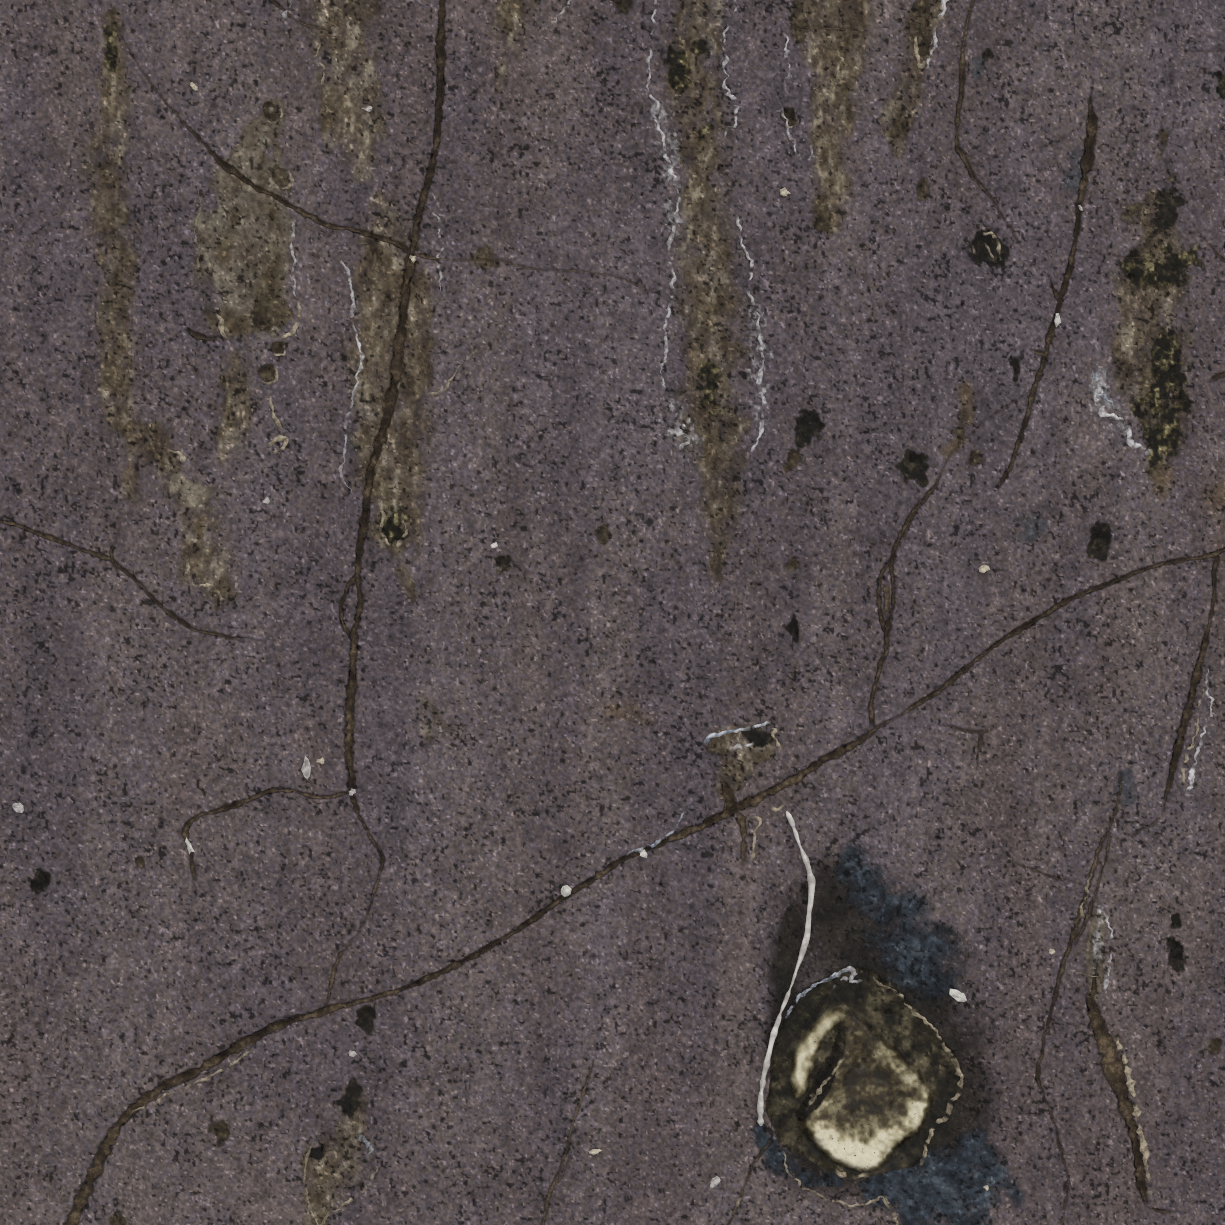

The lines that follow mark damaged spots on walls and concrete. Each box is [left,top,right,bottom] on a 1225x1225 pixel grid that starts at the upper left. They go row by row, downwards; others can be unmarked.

leakage [781,0,869,233]
crack [955,0,1018,242]
crack [0,520,247,639]
leakage [218,357,250,457]
crack [145,0,450,926]
leakage [646,0,768,579]
crack [999,91,1098,487]
crack [63,460,1225,1225]
peeling [705,721,781,799]
spalling [766,966,963,1207]
leakage [768,866,984,1170]
spalling [949,989,967,1002]